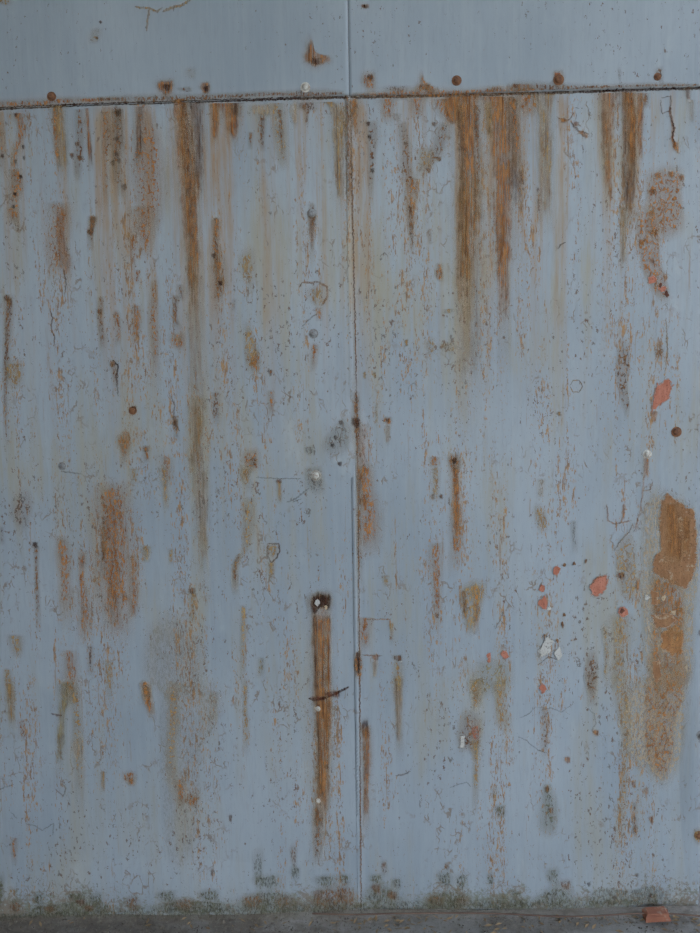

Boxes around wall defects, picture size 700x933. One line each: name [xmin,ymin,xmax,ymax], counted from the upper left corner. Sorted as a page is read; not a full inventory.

rust [305,42,327,66]
rust [0,69,700,381]
rust [4,295,21,406]
peeling [650,378,674,421]
rust [96,488,148,616]
rust [432,456,462,553]
peeling [589,575,609,597]
rust [353,393,391,908]
rust [604,495,699,833]
rust [313,615,331,851]